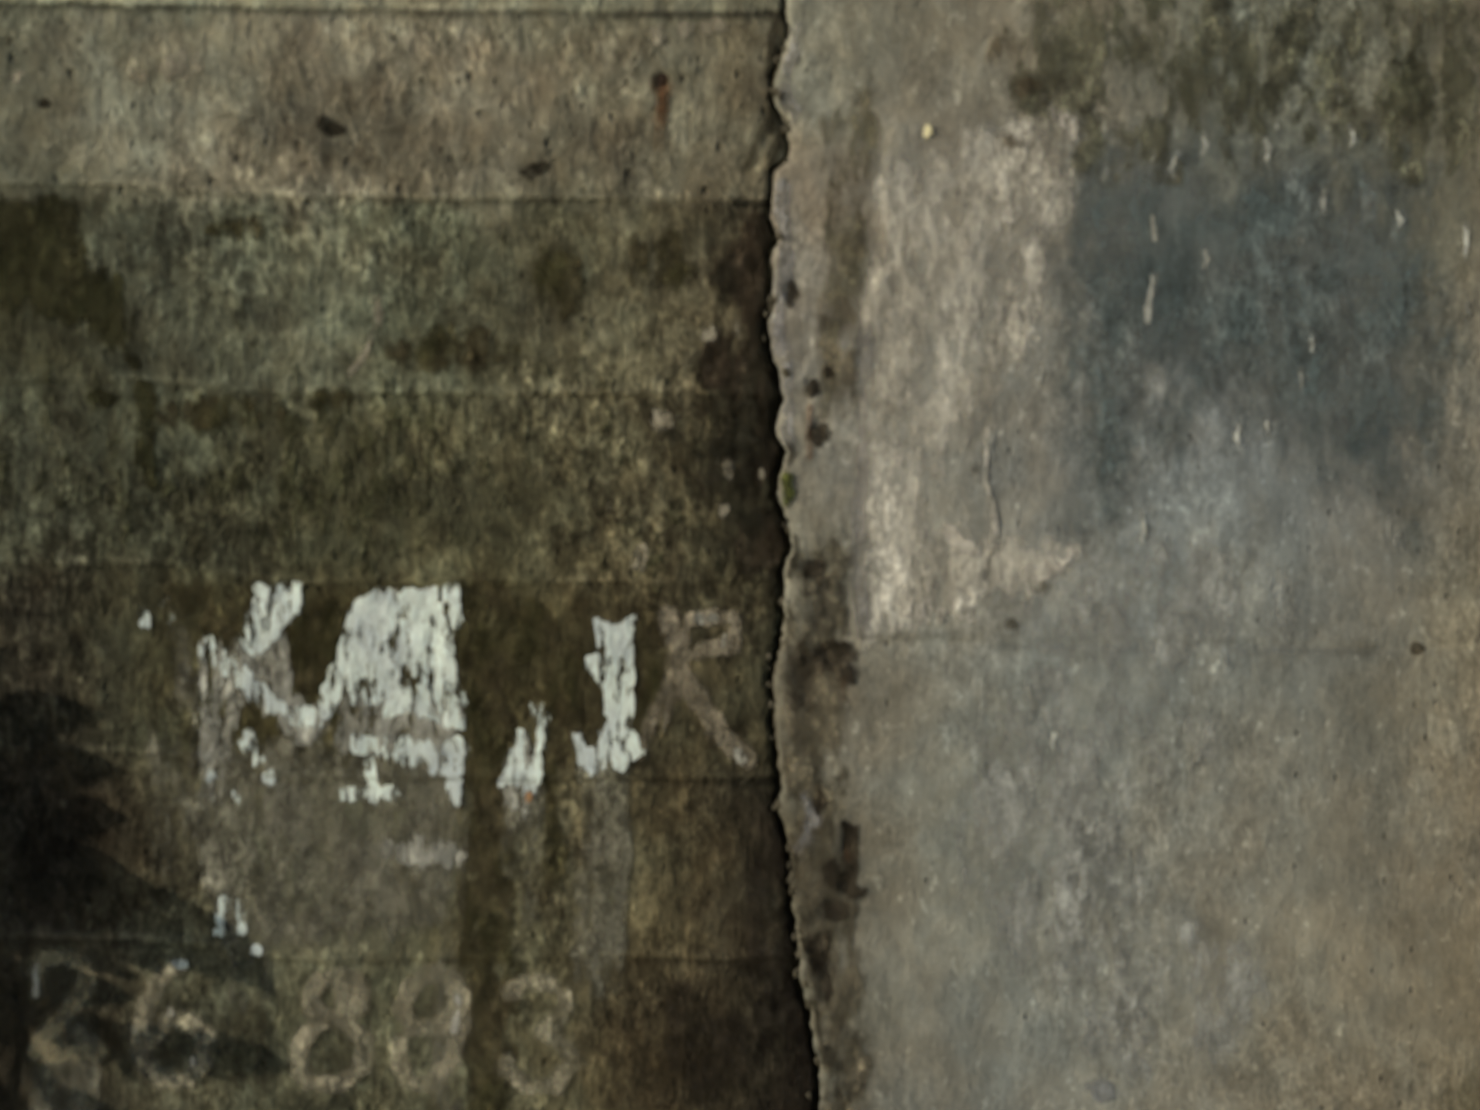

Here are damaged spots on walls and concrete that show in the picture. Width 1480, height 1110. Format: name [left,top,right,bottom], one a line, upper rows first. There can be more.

damp [1009,0,1480,517]
peeling [197,632,465,802]
peeling [503,735,532,818]